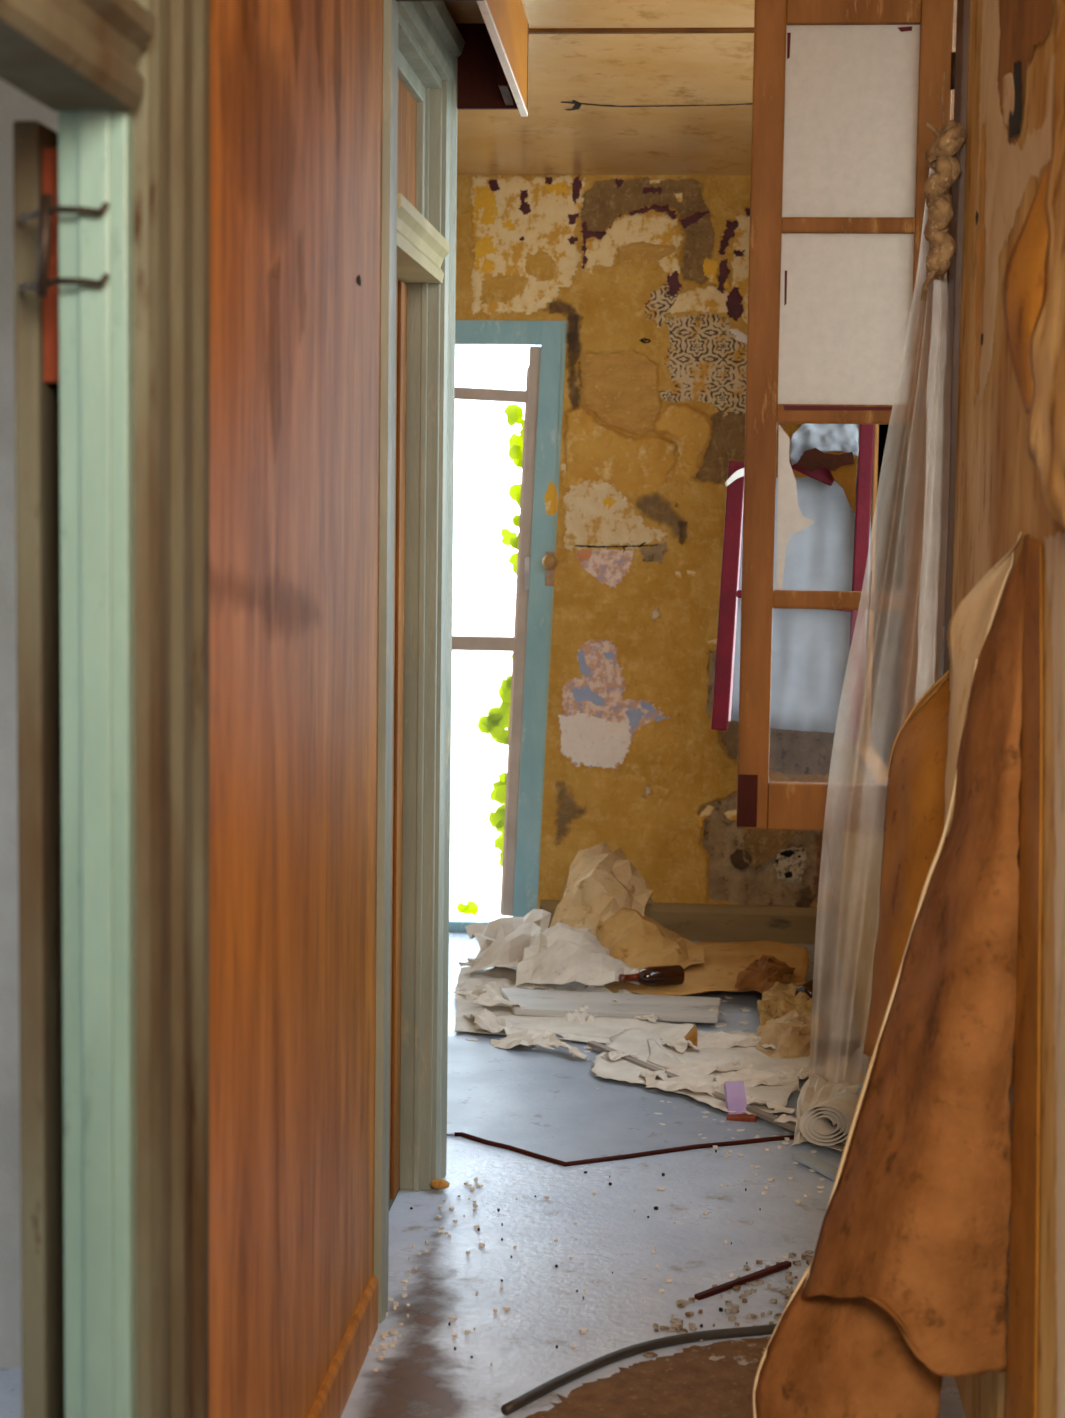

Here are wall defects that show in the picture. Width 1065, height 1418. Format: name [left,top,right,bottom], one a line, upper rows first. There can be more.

peeling [470,175,750,324]
peeling [975,0,1054,405]
flaking render [582,351,661,435]
peeling [544,463,696,588]
peeling [558,639,670,769]
flaking render [698,793,823,907]